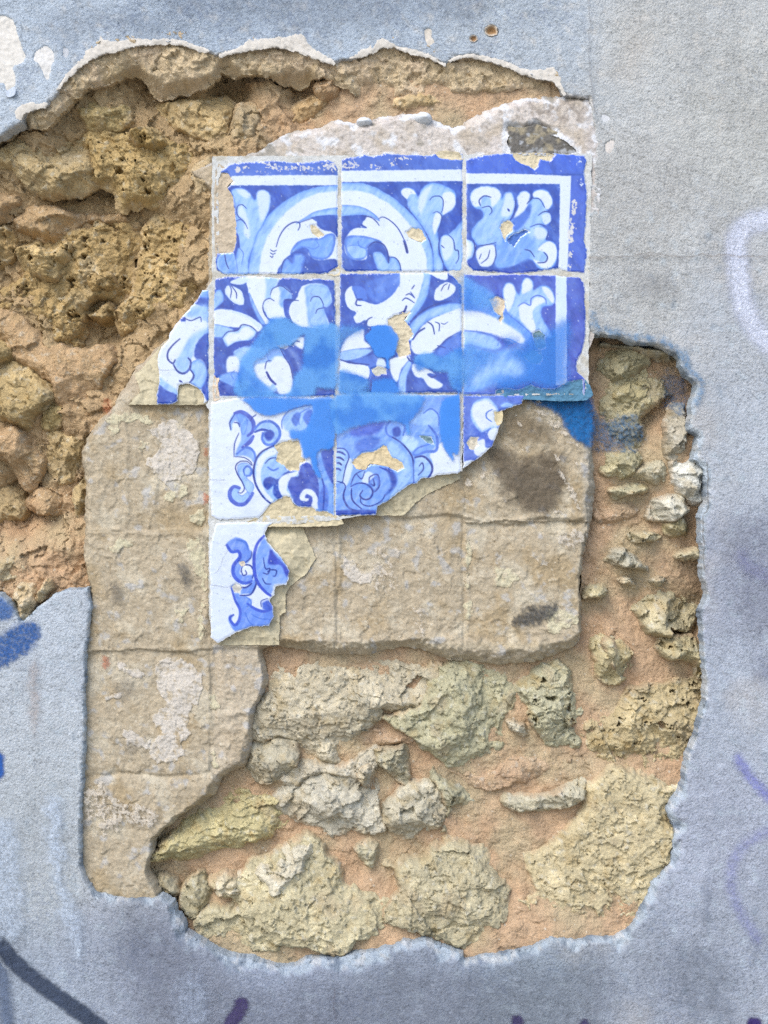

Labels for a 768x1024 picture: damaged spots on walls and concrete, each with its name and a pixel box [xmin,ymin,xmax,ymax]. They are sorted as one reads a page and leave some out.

spalling [0,16,576,620]
spalling [84,337,703,963]
water stain [489,448,566,513]